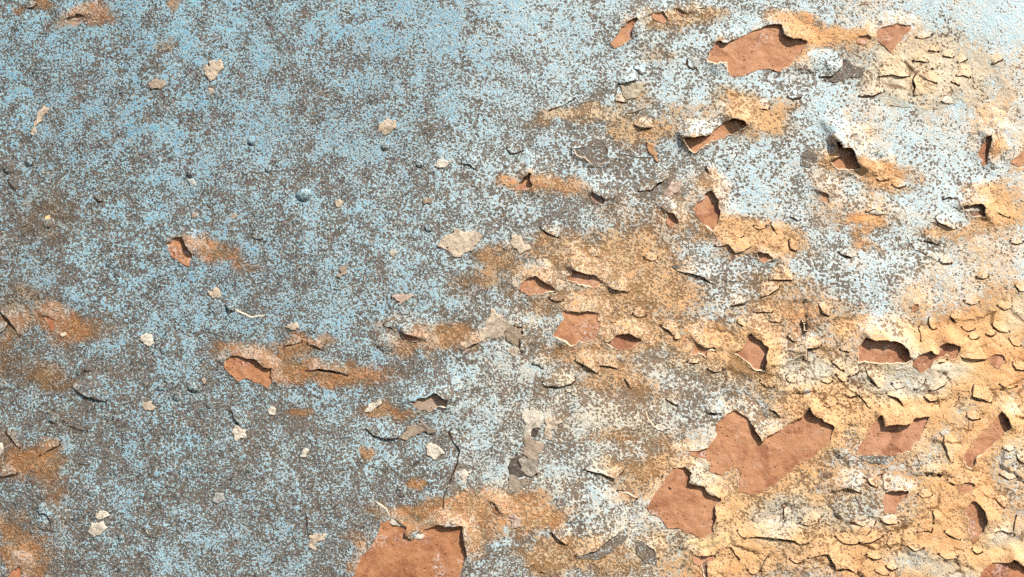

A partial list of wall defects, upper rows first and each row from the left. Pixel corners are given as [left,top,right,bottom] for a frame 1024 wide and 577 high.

peeling [688,7,818,83]
peeling [568,94,766,242]
peeling [801,108,896,217]
peeling [157,213,214,271]
peeling [212,340,288,415]
peeling [506,234,656,355]
peeling [845,285,1019,377]
peeling [639,388,949,577]
peeling [951,388,1024,577]
peeling [346,505,484,577]